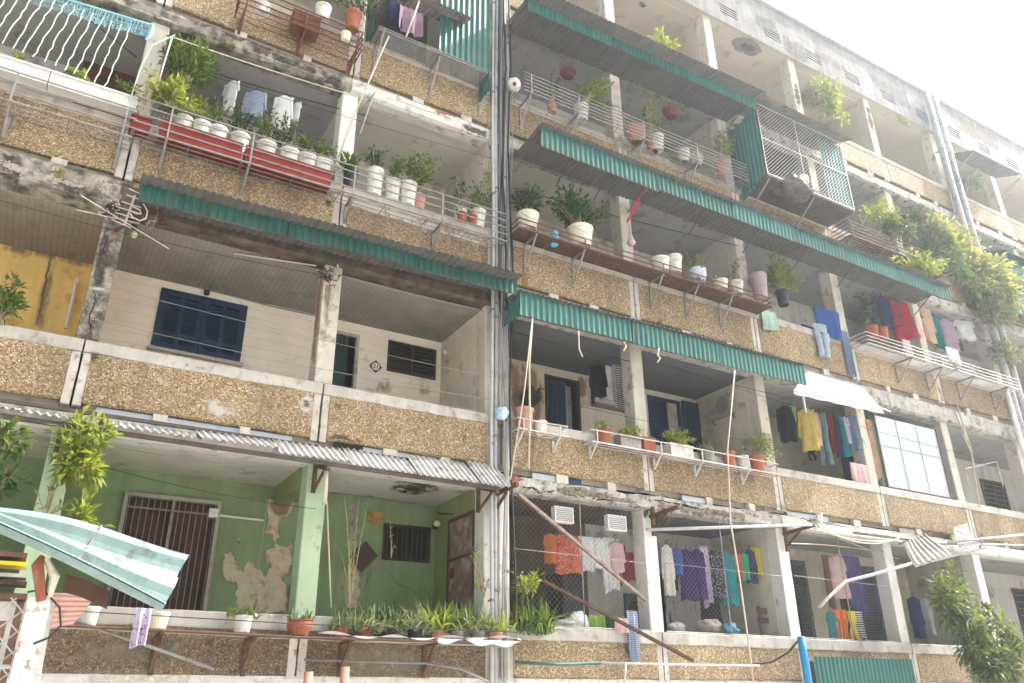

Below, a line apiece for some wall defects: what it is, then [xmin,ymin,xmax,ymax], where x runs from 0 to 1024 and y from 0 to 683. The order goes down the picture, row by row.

leakage [732,38,761,56]
peeling [221,498,295,614]